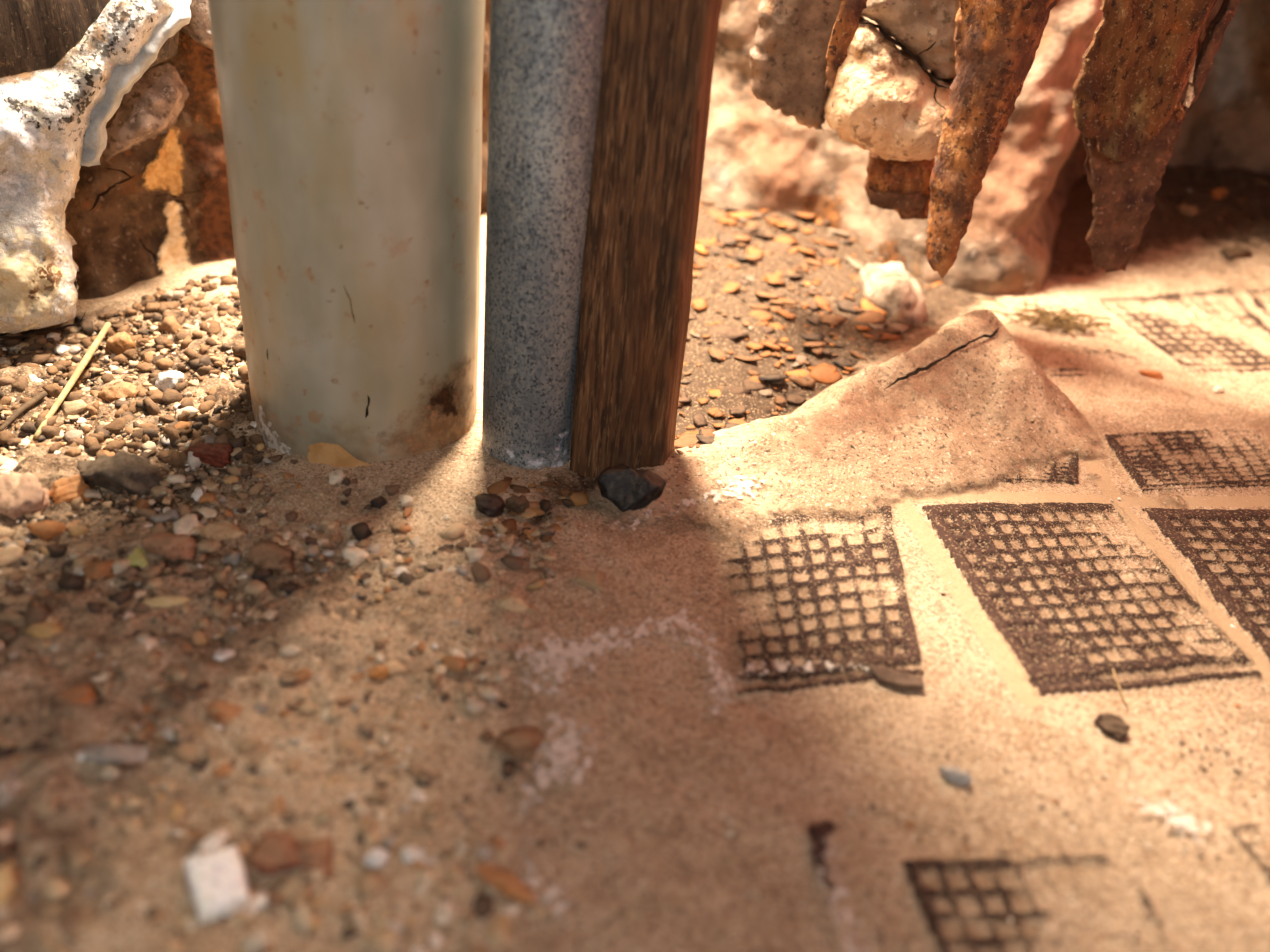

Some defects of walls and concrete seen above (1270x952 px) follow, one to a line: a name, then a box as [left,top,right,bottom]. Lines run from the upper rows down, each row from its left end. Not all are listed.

rust [805,187,848,231]
rust [878,240,921,277]
crack [884,328,999,390]
rust [393,385,472,453]
efflorescence [515,608,869,715]
efflorescence [517,712,597,932]